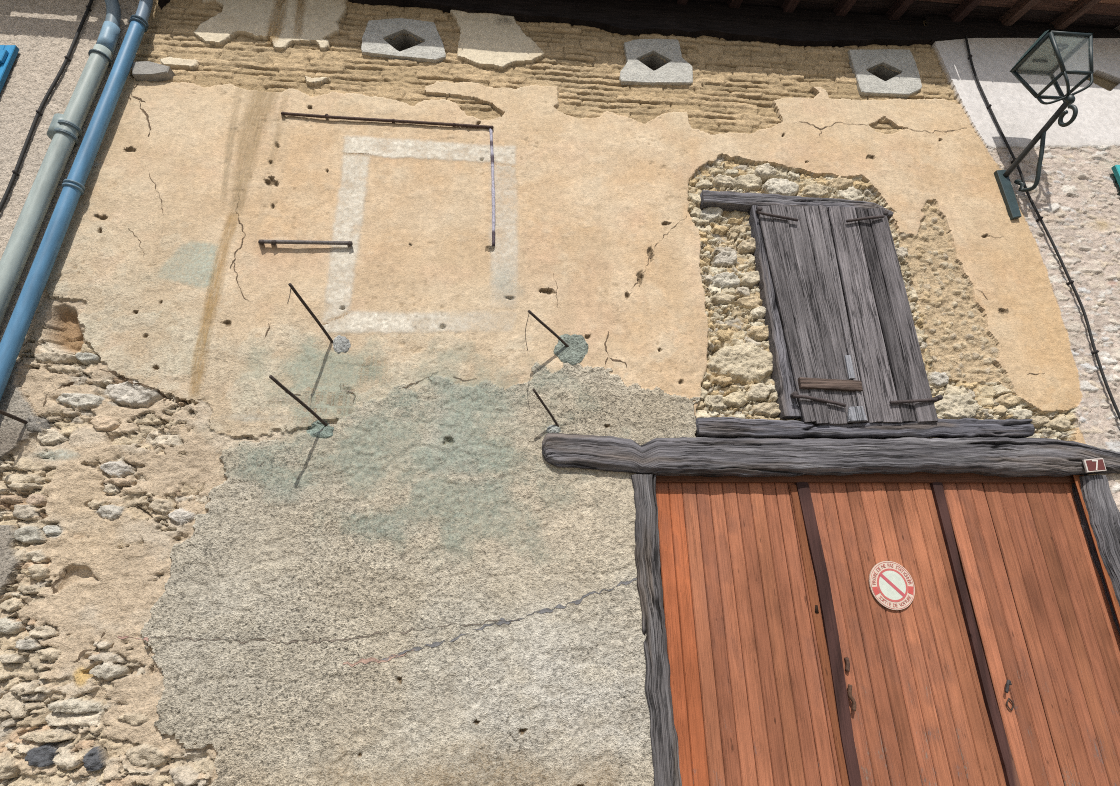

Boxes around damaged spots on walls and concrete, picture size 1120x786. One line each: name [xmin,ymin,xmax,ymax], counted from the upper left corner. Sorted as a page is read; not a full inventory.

spalling [135,0,962,137]
crack [230,195,248,300]
spalling [687,153,1080,442]
spalling [0,287,339,786]
crack [73,578,637,667]